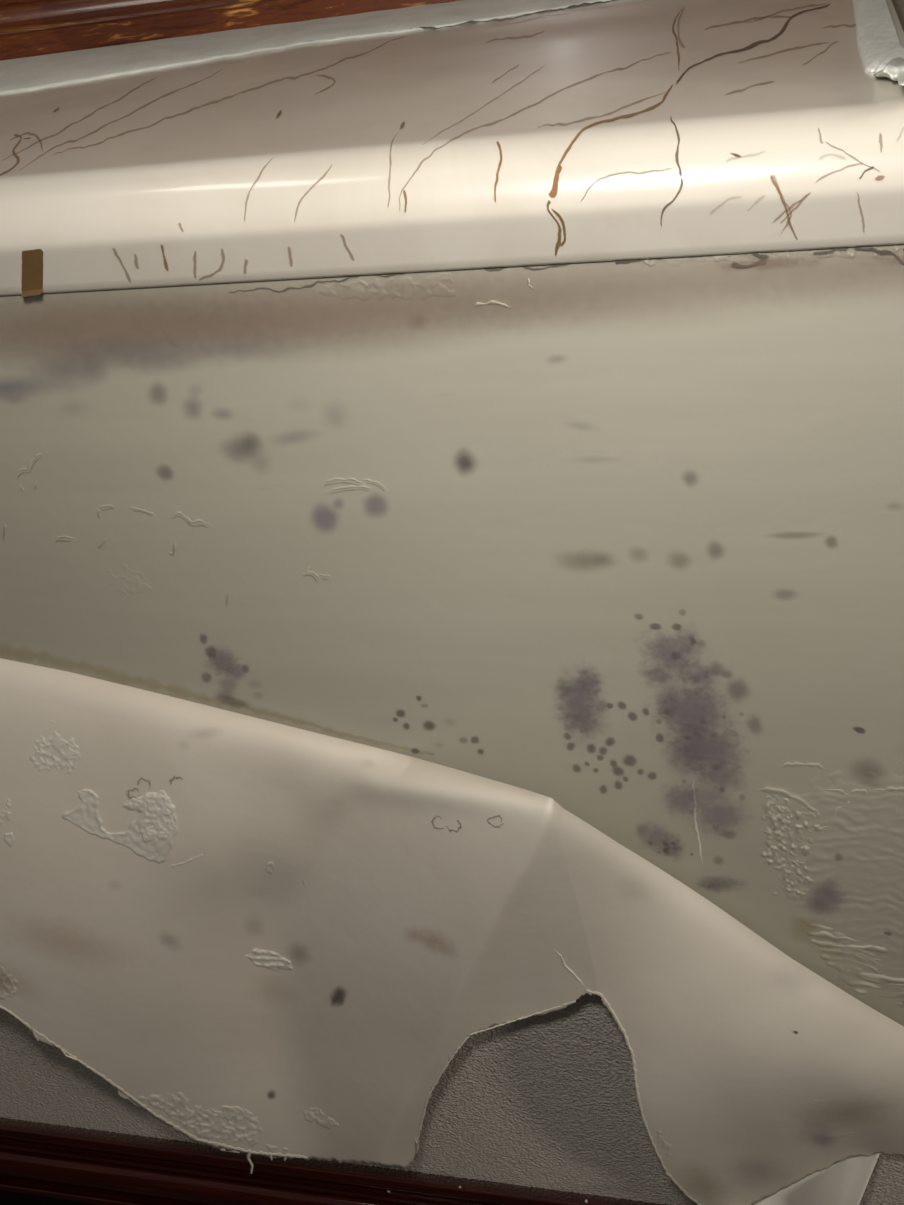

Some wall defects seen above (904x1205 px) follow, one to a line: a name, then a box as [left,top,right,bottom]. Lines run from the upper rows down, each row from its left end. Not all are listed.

crack [420,0,616,29]
crack [0,134,30,176]
crack [494,142,502,202]
crack [547,4,830,256]
peeling [0,658,904,1205]